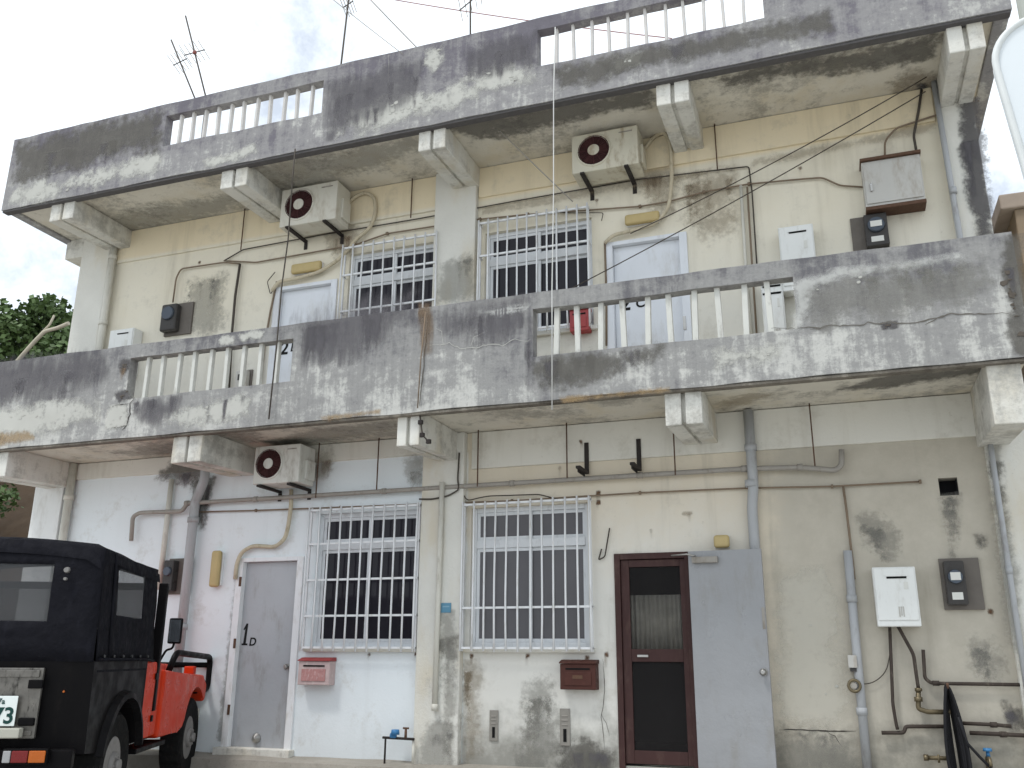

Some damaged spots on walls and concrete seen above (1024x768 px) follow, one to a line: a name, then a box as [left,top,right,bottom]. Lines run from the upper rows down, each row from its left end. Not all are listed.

damp [15,114,162,184]
crack [775,312,1007,330]
damp [158,464,216,528]